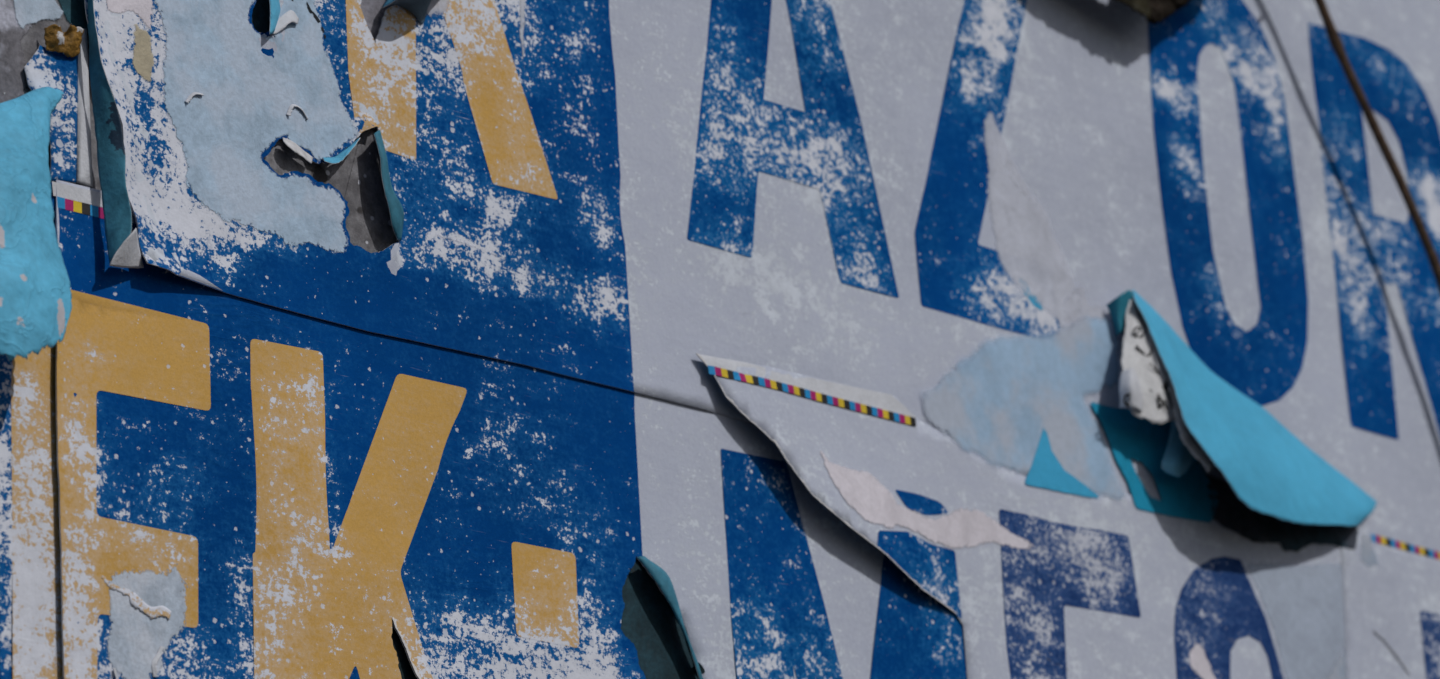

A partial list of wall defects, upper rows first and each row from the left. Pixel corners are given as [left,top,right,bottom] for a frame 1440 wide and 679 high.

peeling [0,87,72,362]
peeling [107,0,358,253]
peeling [1116,0,1191,25]
peeling [696,353,1033,613]
peeling [923,114,1377,679]
peeling [101,566,188,679]